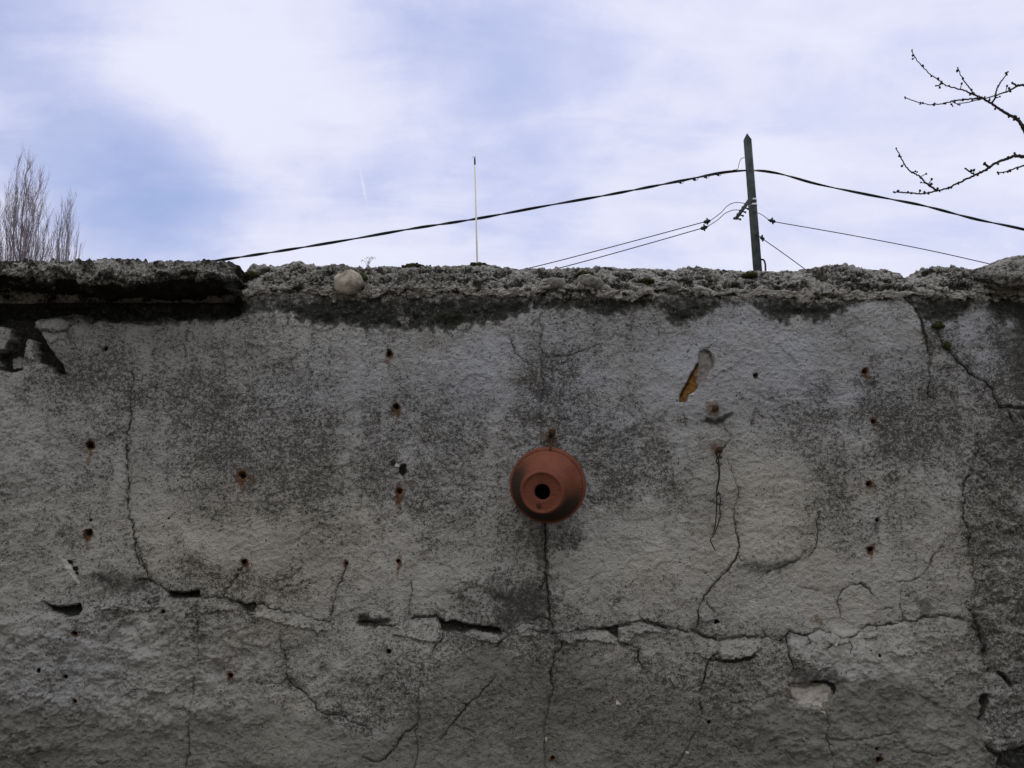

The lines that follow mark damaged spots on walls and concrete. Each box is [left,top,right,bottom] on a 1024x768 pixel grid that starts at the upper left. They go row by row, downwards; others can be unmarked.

water stain [84,294,721,333]
crack [511,314,599,397]
spalling [679,351,712,402]
water stain [753,298,849,326]
water stain [907,295,970,322]
crack [903,297,1024,421]
water stain [987,299,1024,359]
crack [126,373,346,761]
crack [357,426,988,768]
crack [266,646,371,731]
spalling [791,645,839,714]